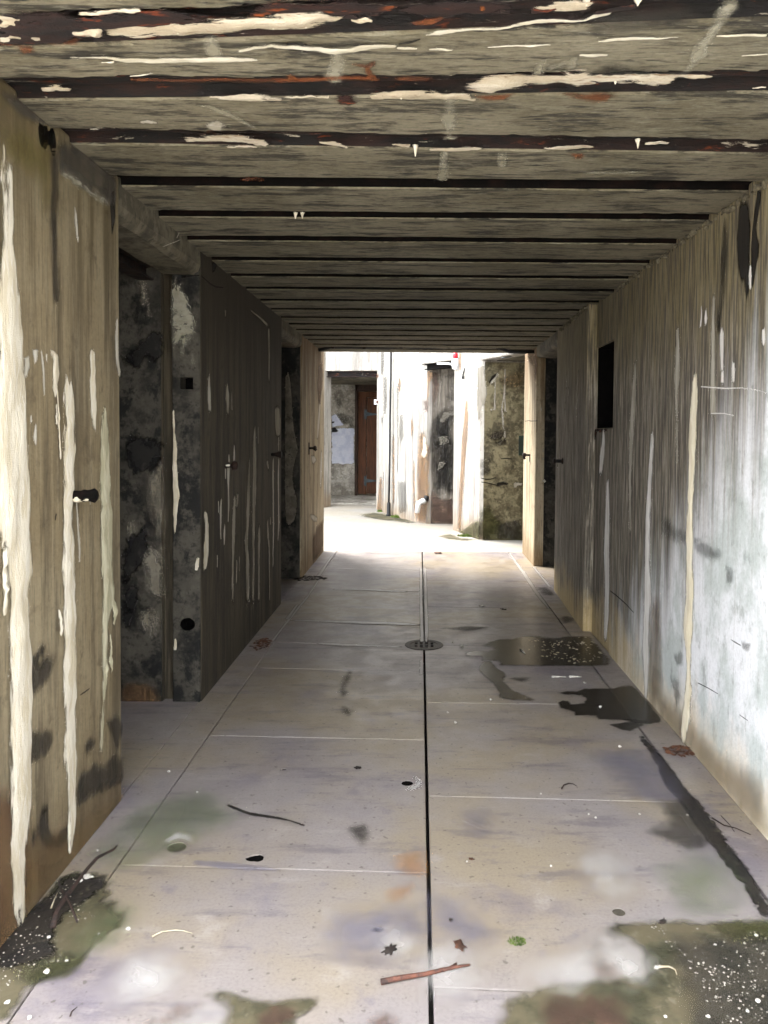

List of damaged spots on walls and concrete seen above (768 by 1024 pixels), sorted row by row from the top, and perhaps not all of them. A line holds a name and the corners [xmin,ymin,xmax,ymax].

spalling [531,0,638,14]
spalling [0,9,212,46]
corrosion [132,61,376,82]
leakage [674,190,761,743]
leakage [0,144,180,947]
leakage [610,722,643,731]